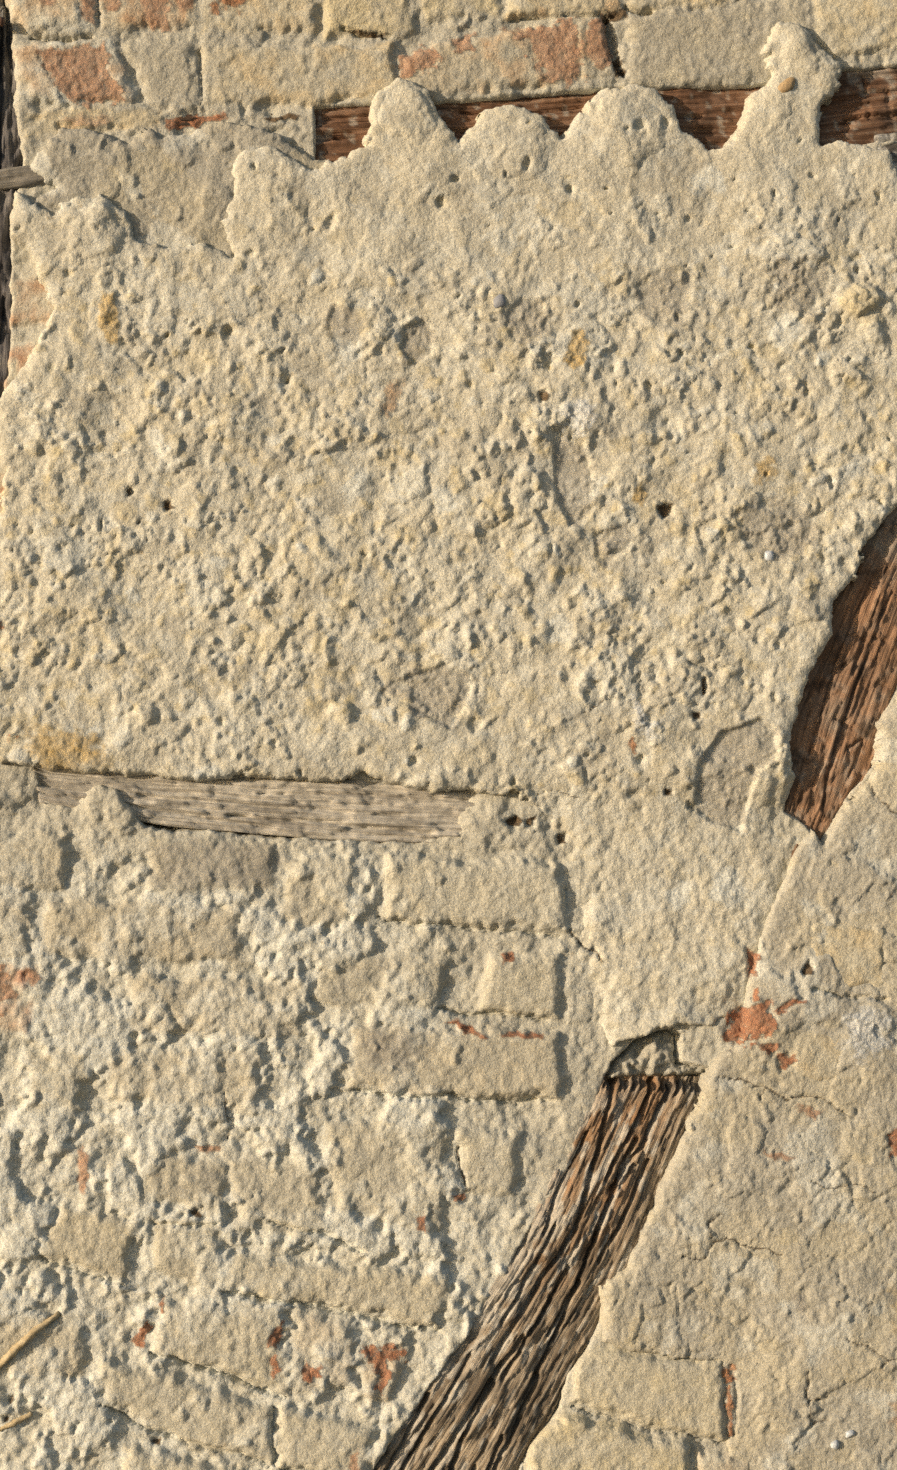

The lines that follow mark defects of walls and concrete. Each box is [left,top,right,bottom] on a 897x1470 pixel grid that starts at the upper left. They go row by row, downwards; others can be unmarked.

peeling [36,0,125,109]
peeling [399,32,476,78]
peeling [503,14,626,88]
peeling [165,111,226,131]
spalling [743,498,818,556]
crack [730,1078,850,1118]
crack [682,1214,782,1260]